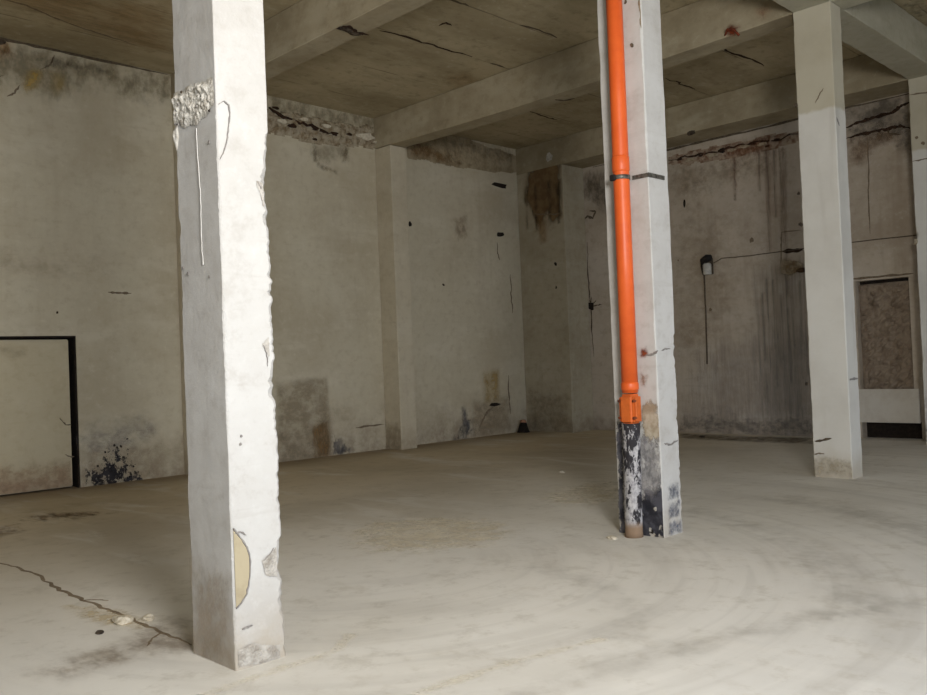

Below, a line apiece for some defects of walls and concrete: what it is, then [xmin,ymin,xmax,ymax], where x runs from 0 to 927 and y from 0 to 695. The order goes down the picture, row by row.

crack [382,0,505,68]
spalling [171,77,214,128]
spalling [267,106,377,150]
peeling [407,135,517,189]
crack [666,118,798,151]
crack [836,92,927,228]
leakage [85,438,143,486]
crack [0,563,192,646]